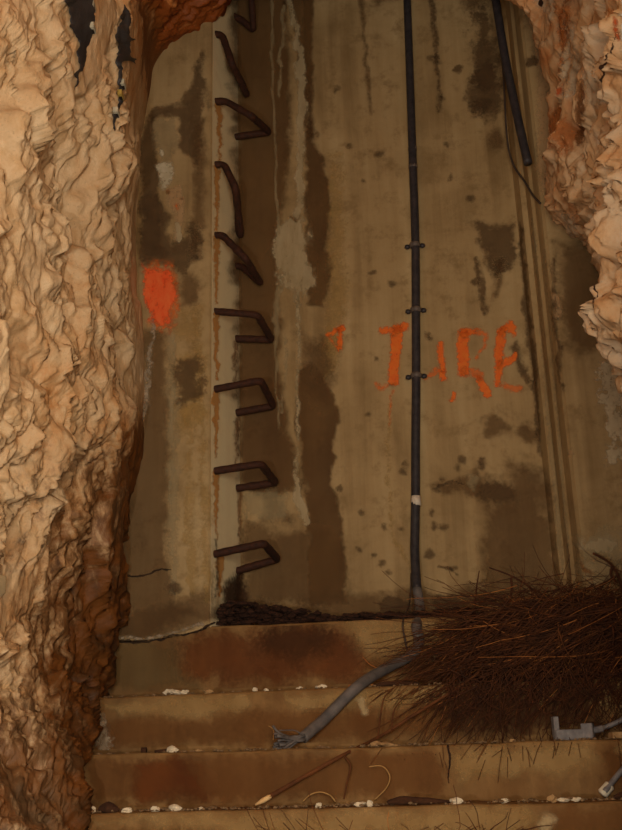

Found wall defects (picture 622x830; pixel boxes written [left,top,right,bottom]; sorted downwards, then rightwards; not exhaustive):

leakage [119,331,218,638]
leakage [138,53,205,303]
corrosion [211,391,220,454]
corrosion [213,103,223,380]
leakage [216,0,555,616]
crack [119,622,215,644]